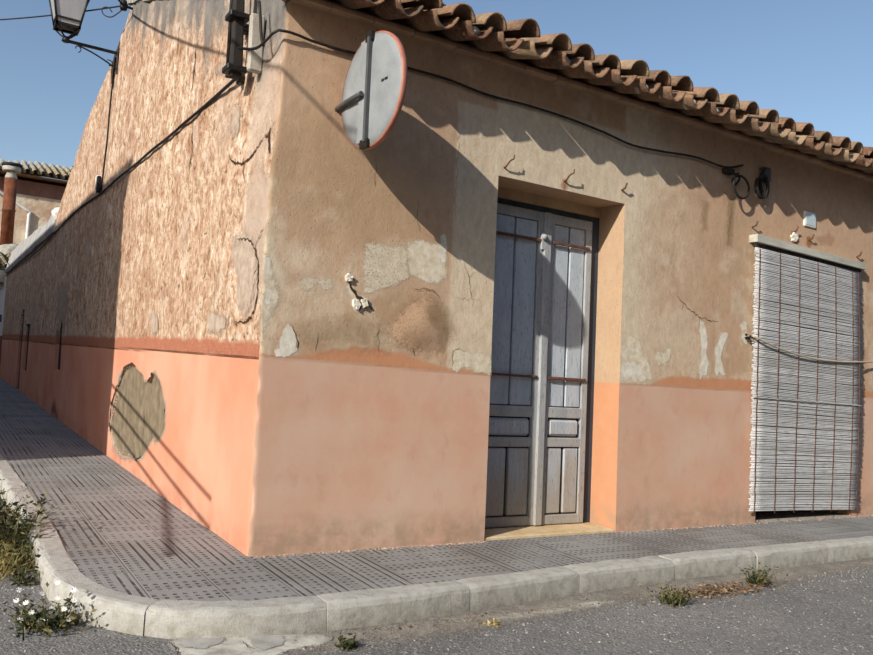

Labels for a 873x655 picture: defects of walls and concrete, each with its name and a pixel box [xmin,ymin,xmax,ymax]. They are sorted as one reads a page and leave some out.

crack [234,229,263,324]
flaking render [298,234,448,315]
flaking render [274,323,299,357]
flaking render [620,333,672,383]
peeling [699,320,728,380]
spalling [739,320,748,346]
spalling [109,362,167,464]